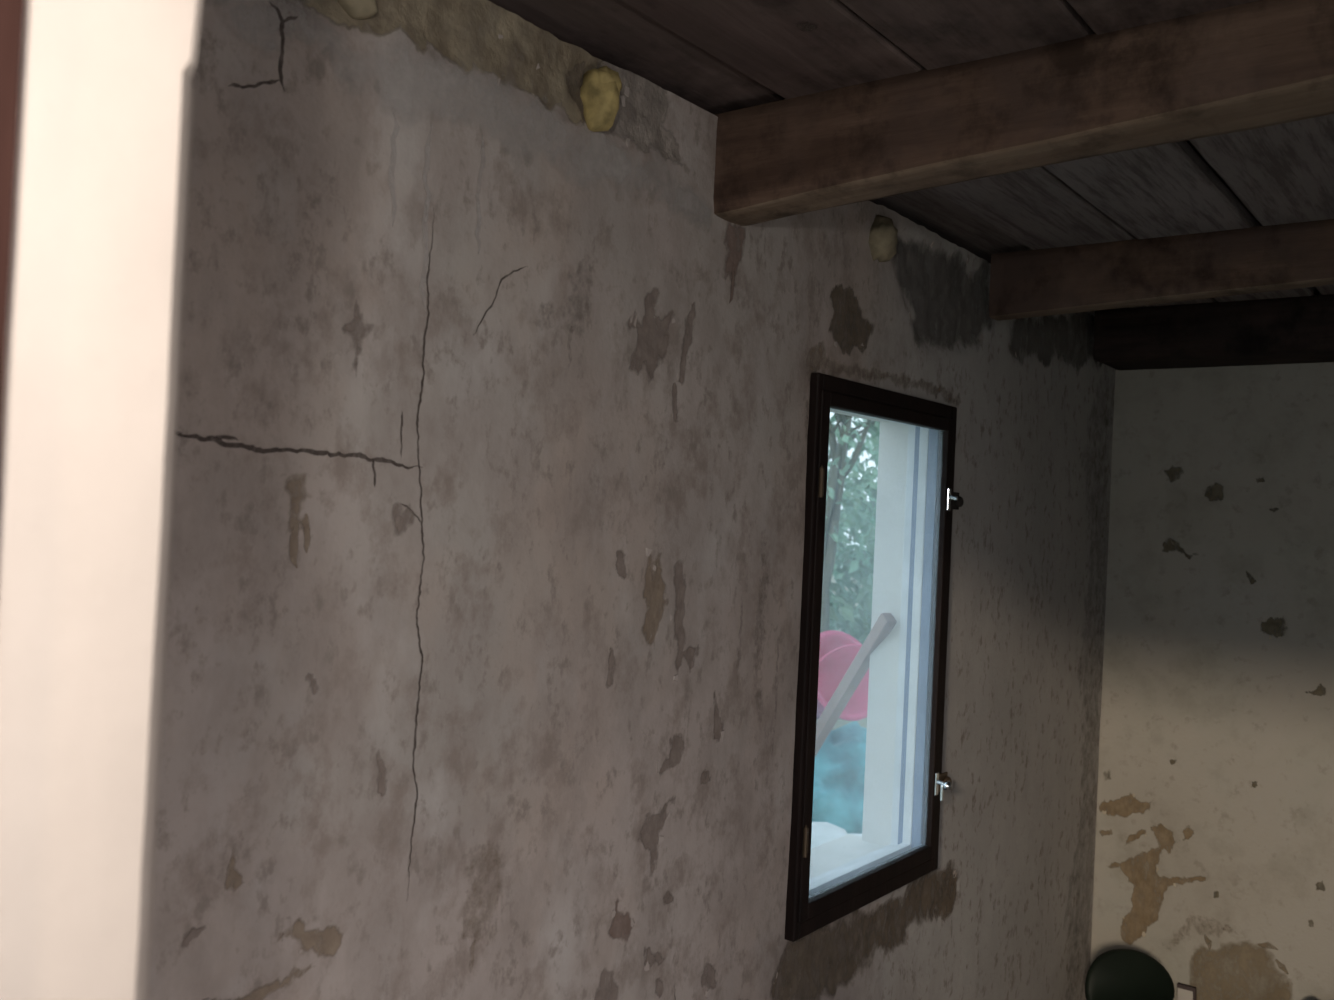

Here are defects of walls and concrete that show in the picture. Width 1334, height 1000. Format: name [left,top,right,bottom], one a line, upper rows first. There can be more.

crack [229,2,298,92]
flaking render [302,0,681,164]
crack [176,207,434,902]
flaking render [1099,793,1150,836]
flaking render [1109,824,1219,945]